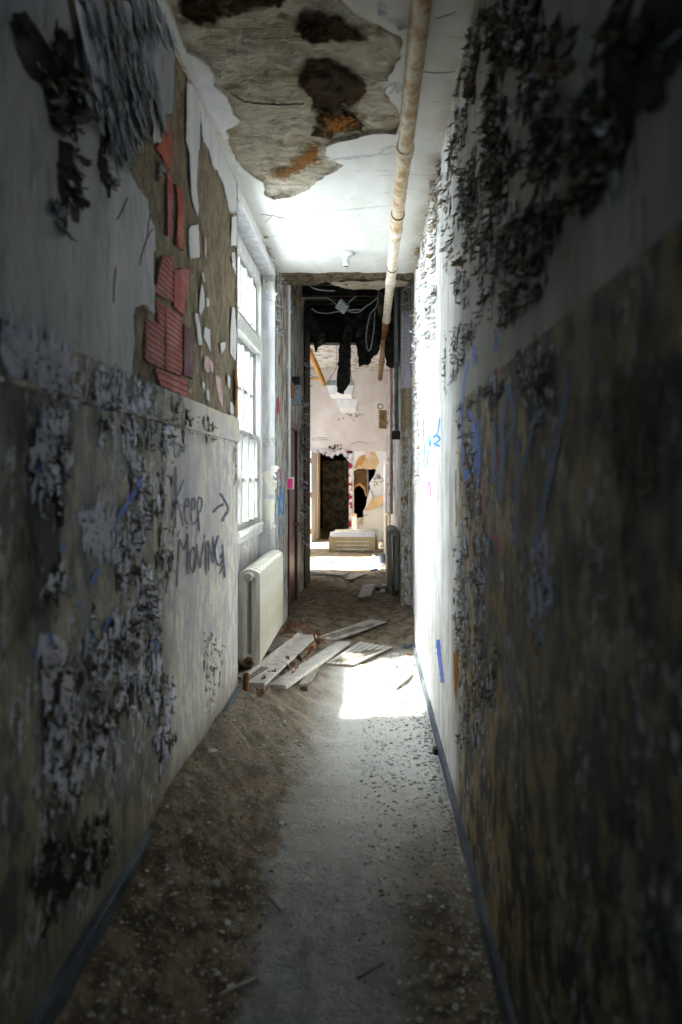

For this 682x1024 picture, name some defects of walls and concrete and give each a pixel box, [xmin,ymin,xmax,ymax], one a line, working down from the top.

spalling [0,0,409,938]
rust [269,112,364,181]
water stain [299,59,366,139]
peeling [262,0,682,603]
peeling [451,371,505,749]
peeling [527,533,553,648]